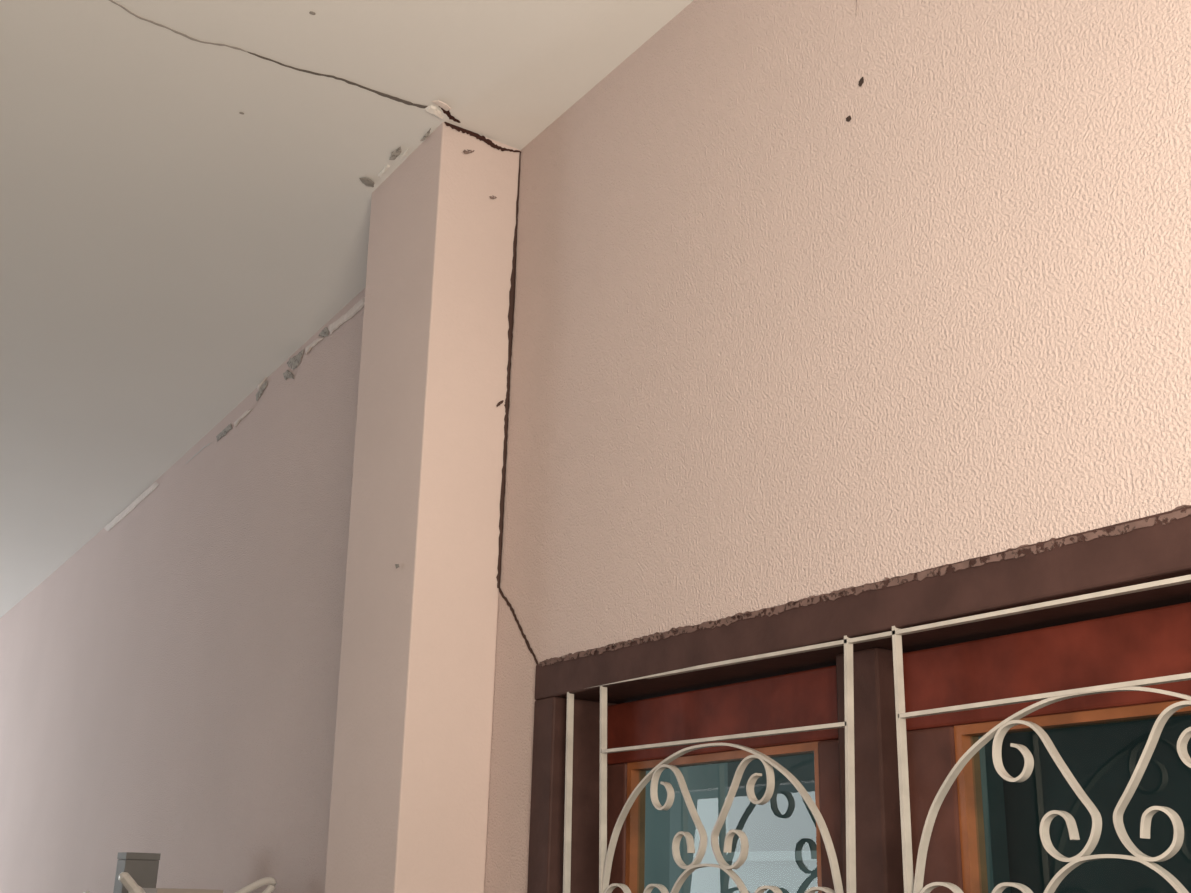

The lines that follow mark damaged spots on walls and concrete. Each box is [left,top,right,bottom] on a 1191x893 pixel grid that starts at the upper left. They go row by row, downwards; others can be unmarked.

crack [109,0,538,665]
peeling [283,297,365,380]